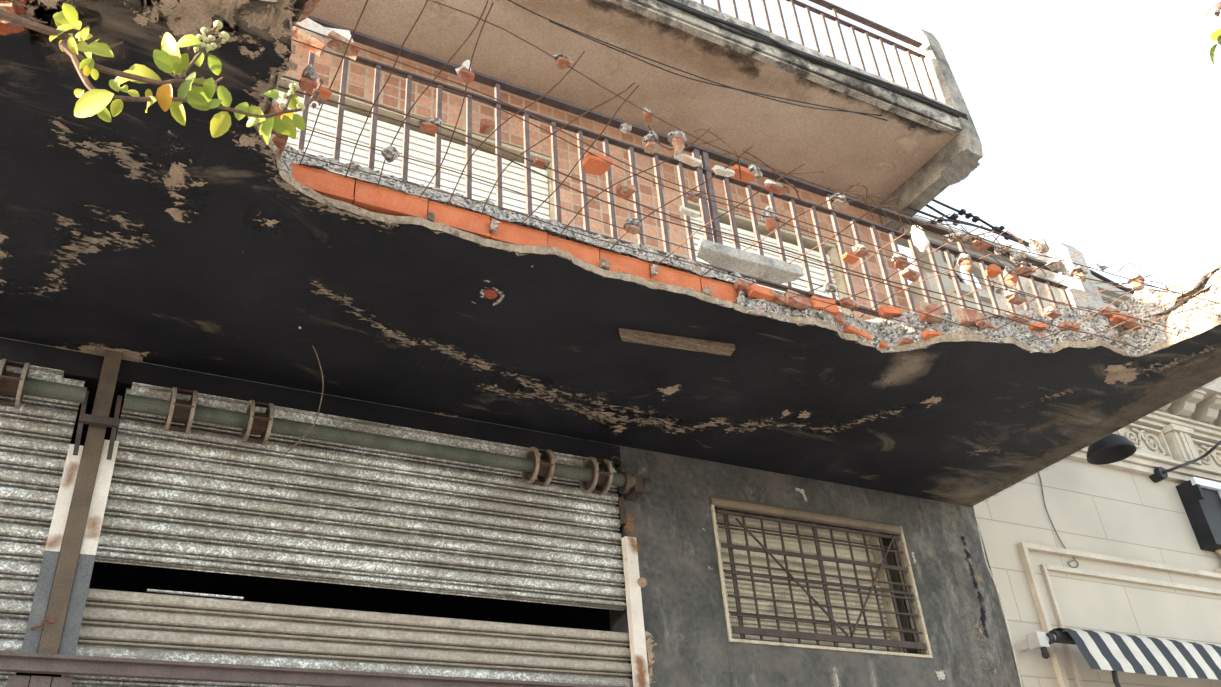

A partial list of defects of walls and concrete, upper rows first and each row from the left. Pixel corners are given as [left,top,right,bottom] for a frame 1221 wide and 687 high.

flaking render [0,0,81,36]
peeling [63,31,114,61]
peeling [48,116,209,223]
flaking render [0,233,12,293]
peeling [20,205,155,299]
spalling [124,0,1221,498]
crack [925,504,1012,687]
rust [636,657,646,687]